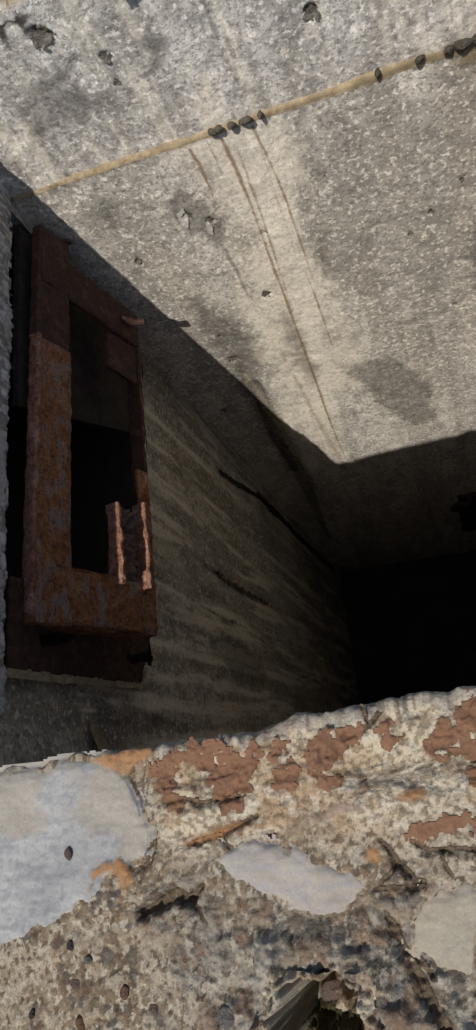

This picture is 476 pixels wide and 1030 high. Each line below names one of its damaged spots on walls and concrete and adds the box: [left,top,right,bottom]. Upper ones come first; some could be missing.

leakage [0,12,32,48]
peeling [422,688,476,788]
peeling [148,719,405,817]
crack [136,830,158,871]
crack [161,795,258,850]
peeling [404,810,476,845]
crack [141,884,208,925]
spalling [250,969,386,1030]